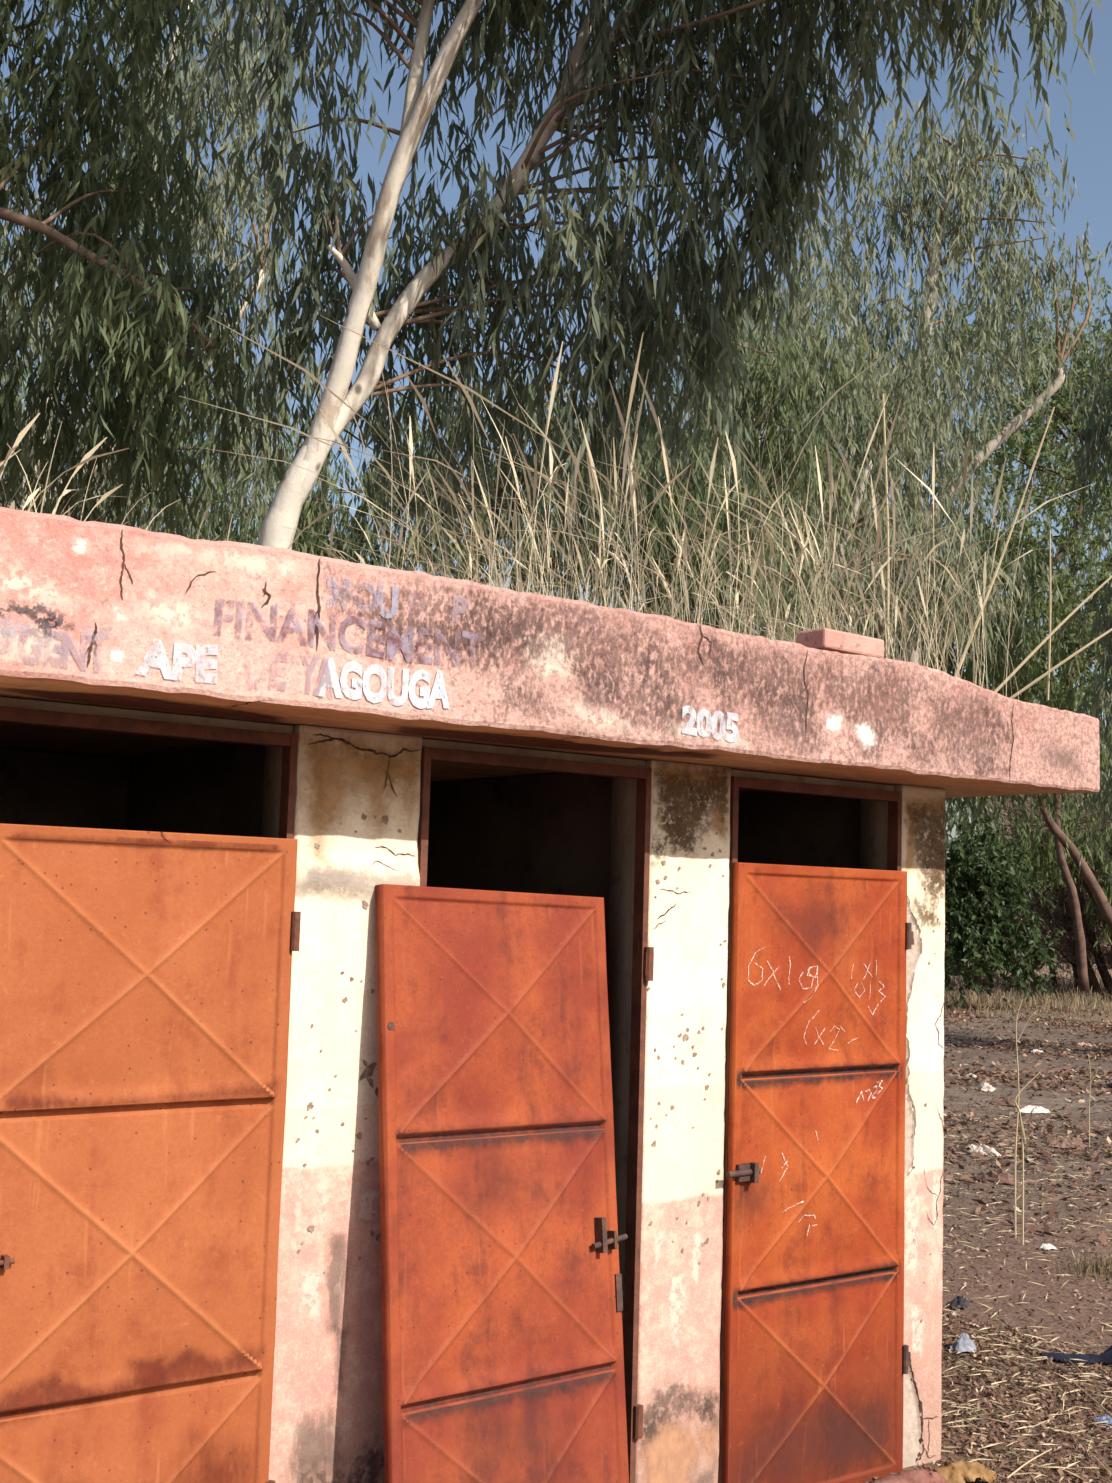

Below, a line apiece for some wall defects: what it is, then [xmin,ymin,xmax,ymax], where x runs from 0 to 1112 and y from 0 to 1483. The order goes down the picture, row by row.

crack [85,529,133,667]
crack [262,583,271,607]
crack [313,559,321,651]
leakage [342,590,817,749]
leakage [827,668,912,750]
leakage [913,702,1001,771]
rust [737,1065,899,1085]
rust [400,1124,603,1152]
leakage [331,1241,343,1345]
rust [733,1265,900,1306]
rust [0,1353,256,1419]
rust [408,1366,613,1420]